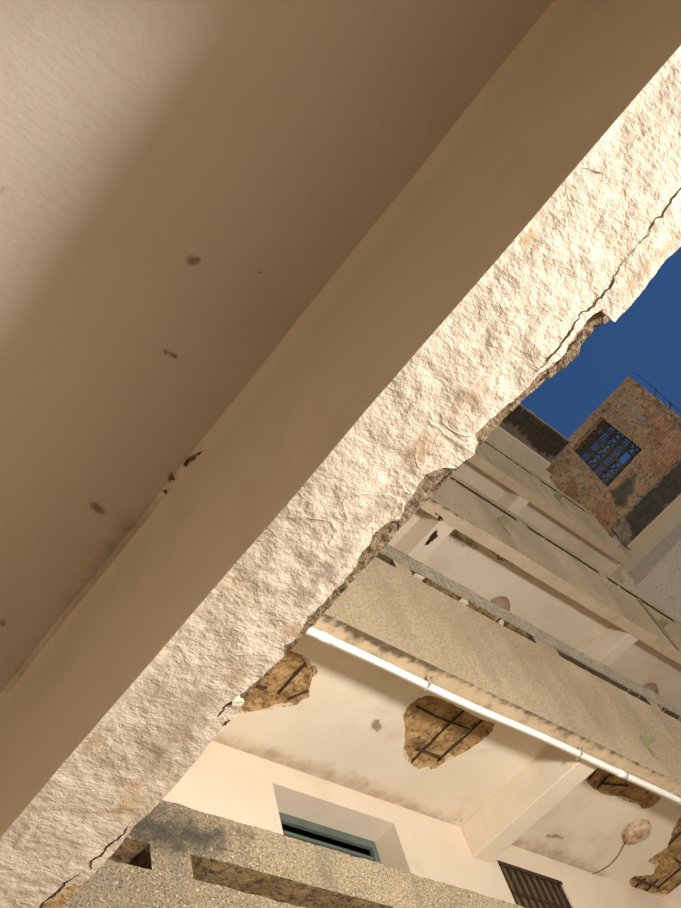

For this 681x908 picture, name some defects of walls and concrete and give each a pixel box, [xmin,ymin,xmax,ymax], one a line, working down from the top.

crack [533,189,681,377]
spalling [475,310,609,449]
damp [503,405,569,457]
flaking render [622,401,681,476]
spalling [222,465,461,720]
spalling [403,696,495,769]
spalling [586,768,661,809]
crack [40,827,128,908]
spalling [630,817,681,897]